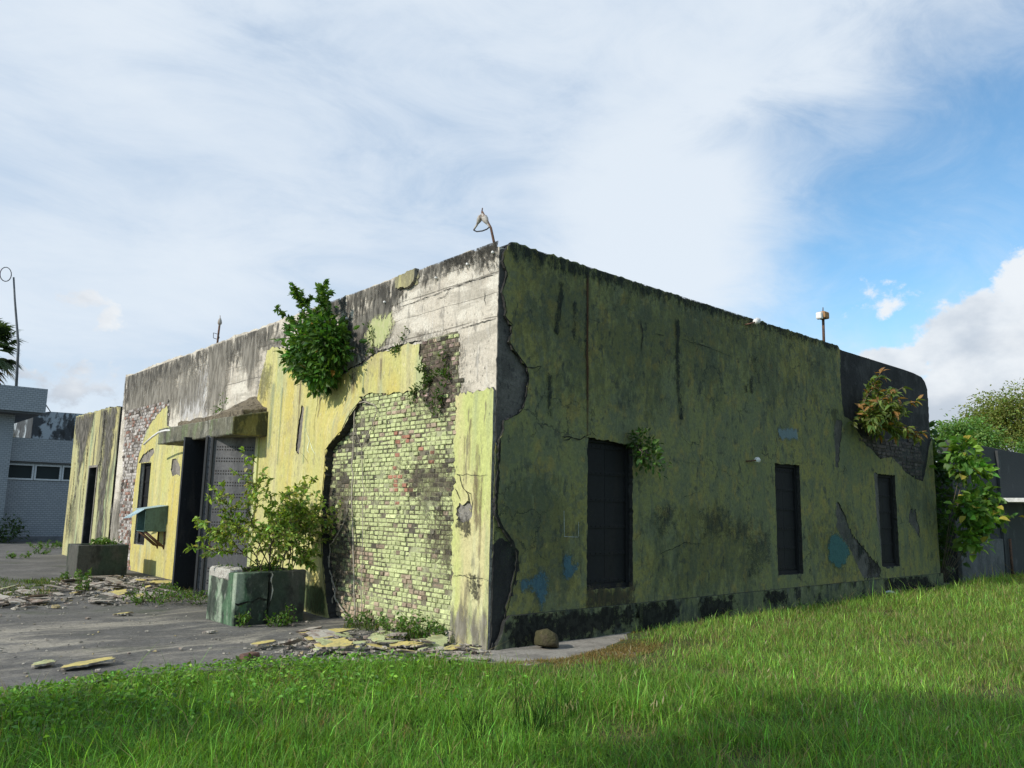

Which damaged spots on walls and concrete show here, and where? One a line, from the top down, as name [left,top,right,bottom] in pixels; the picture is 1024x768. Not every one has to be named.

spalling [0,363,210,610]
water stain [68,323,286,541]
spalling [243,331,520,661]
spalling [493,246,531,498]
water stain [505,583,680,648]
water stain [698,594,741,619]
water stain [764,589,788,606]
spalling [836,502,893,595]
spalling [834,350,930,481]
water stain [887,575,935,592]